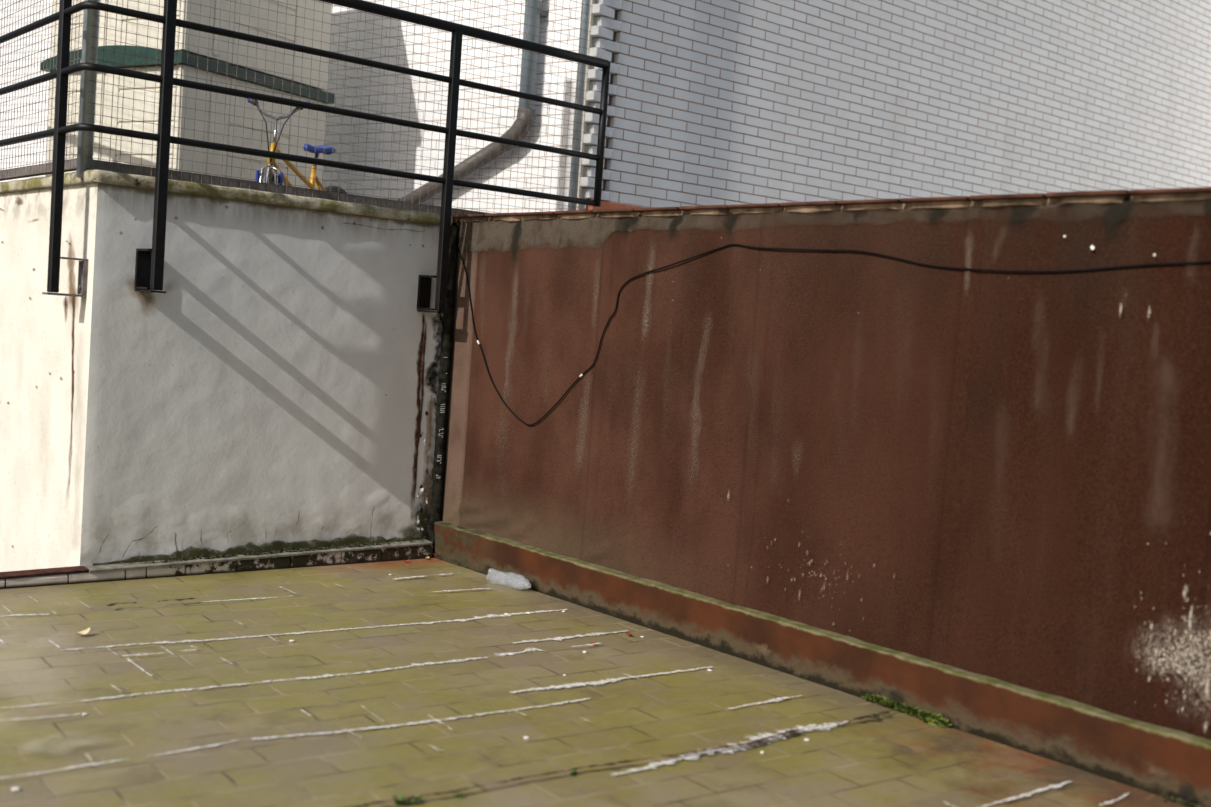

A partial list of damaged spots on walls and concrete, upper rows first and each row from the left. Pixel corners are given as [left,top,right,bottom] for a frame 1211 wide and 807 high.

corrosion [411,315,437,498]